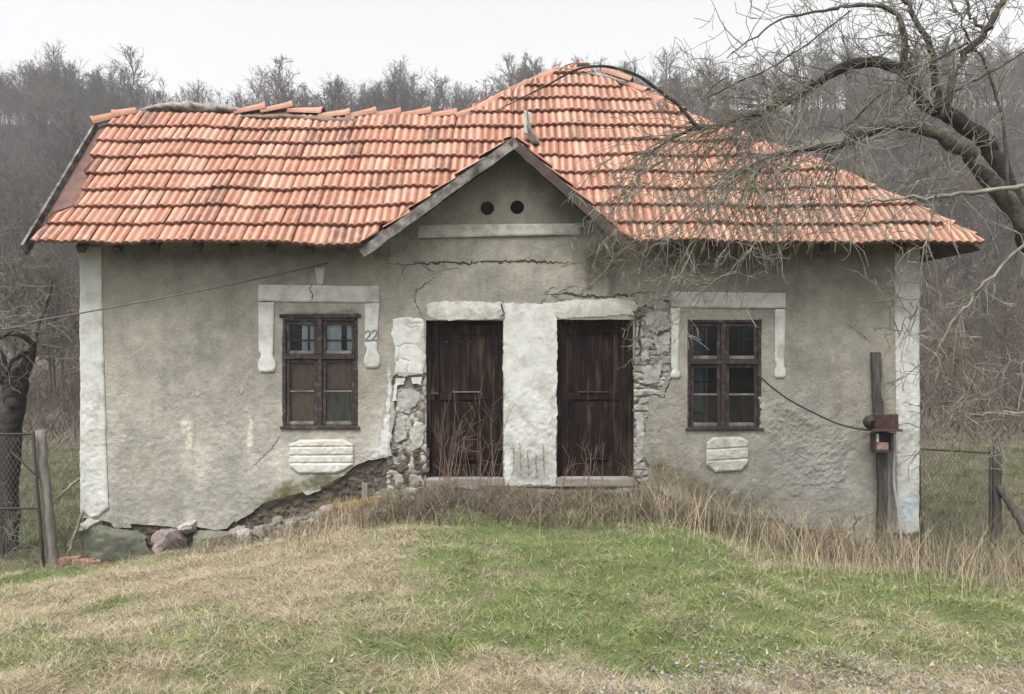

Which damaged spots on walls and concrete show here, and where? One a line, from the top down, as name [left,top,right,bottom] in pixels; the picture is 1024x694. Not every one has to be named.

flaking render [103,317,429,555]
crack [388,256,674,399]
flaking render [631,299,875,548]